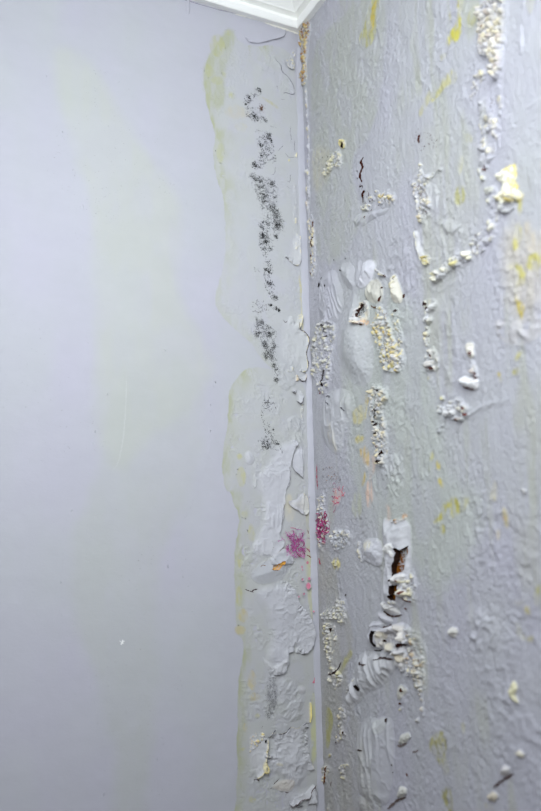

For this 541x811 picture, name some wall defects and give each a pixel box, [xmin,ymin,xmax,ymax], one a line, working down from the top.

leakage [43,40,221,811]
peeling [275,314,310,429]
leakage [200,0,541,811]
peeling [249,439,309,560]
peeling [248,702,317,811]